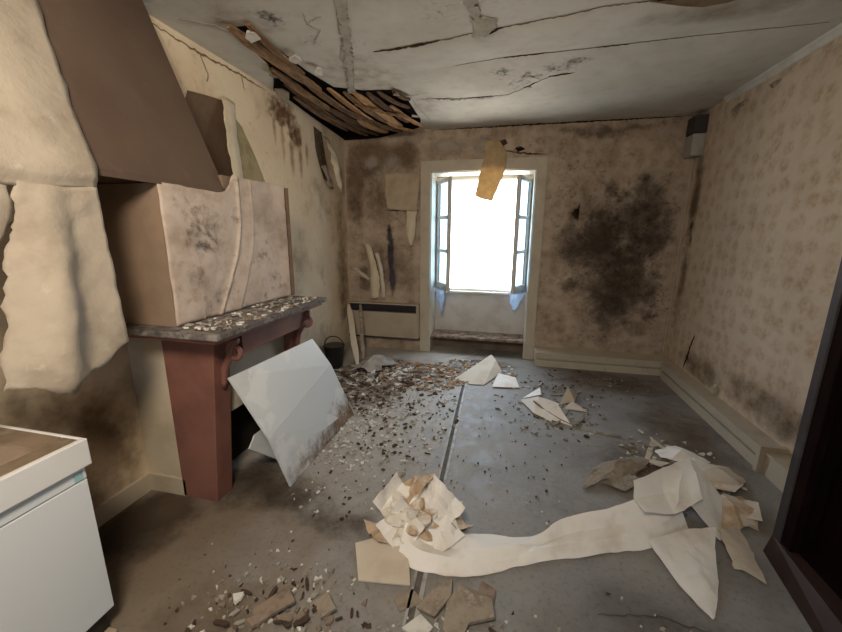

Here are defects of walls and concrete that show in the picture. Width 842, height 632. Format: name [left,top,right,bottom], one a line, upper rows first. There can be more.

flaking render [245,30,261,43]
crack [374,0,736,52]
crack [455,22,828,66]
crack [398,72,693,131]
crack [506,146,546,155]